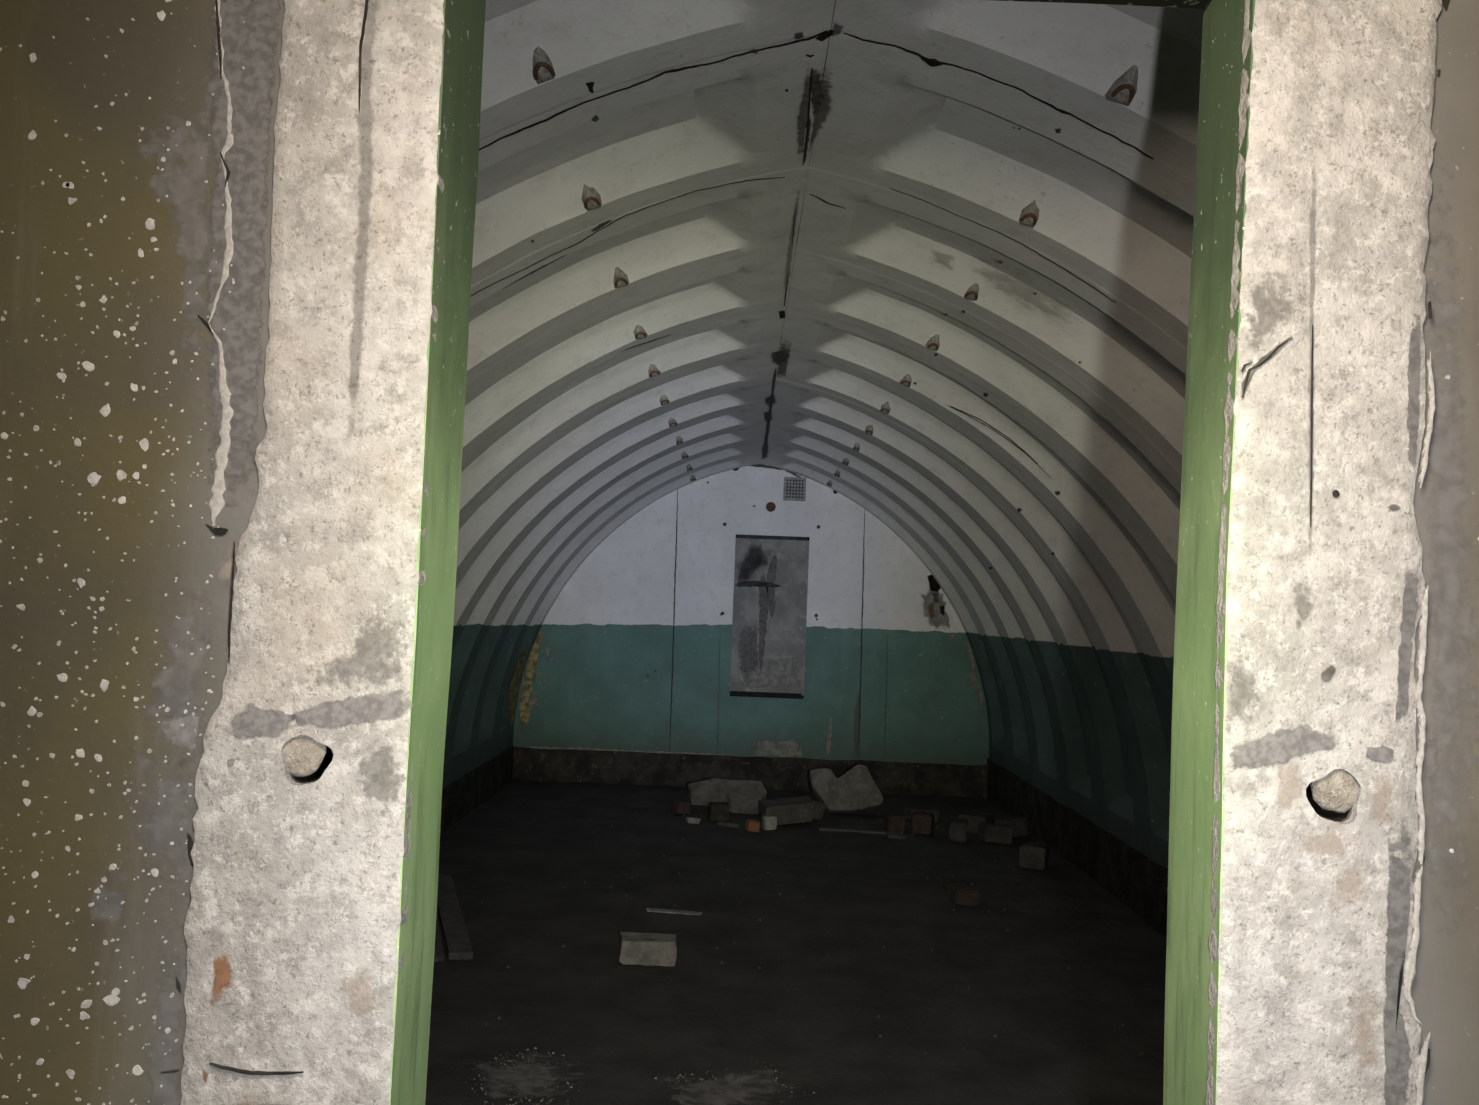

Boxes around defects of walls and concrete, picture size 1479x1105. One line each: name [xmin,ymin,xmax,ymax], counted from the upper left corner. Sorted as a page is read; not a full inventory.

crack [197,0,234,536]
crack [359,0,369,112]
crack [470,30,1154,459]
leakage [797,74,831,153]
crack [1241,274,1313,527]
peeling [0,0,280,1105]
peeling [1396,286,1479,829]
crack [210,1063,304,1075]
peeling [1384,827,1412,1105]